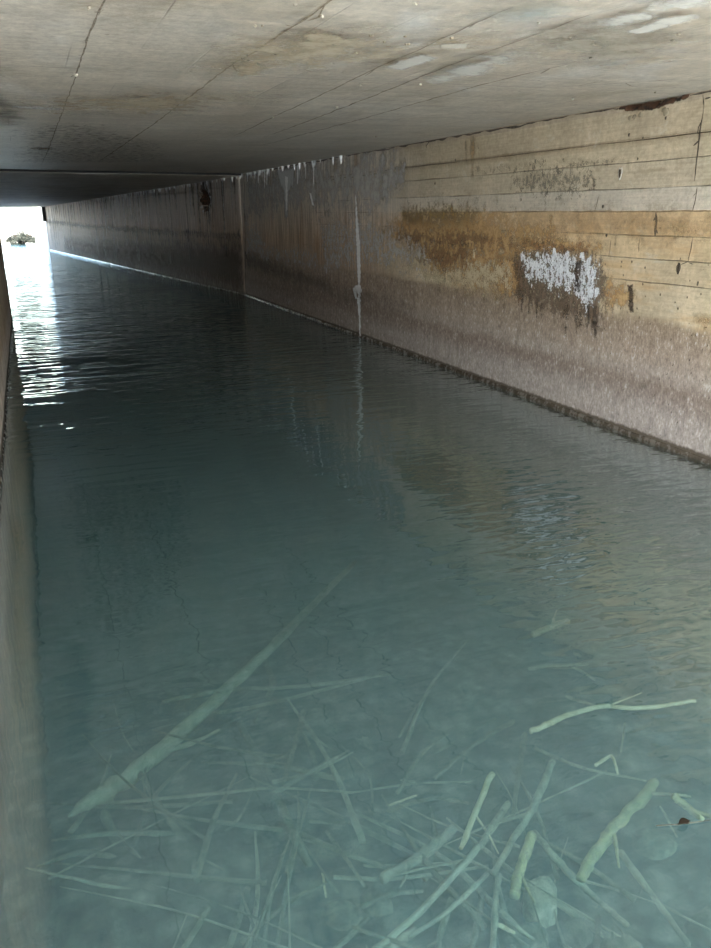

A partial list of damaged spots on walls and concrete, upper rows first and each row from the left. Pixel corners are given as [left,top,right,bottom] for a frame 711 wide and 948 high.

crack [43,0,105,160]
crack [100,0,332,161]
spalling [526,91,711,124]
crack [692,97,711,211]
water stain [47,154,406,336]
corrosion [383,204,603,303]
water stain [513,249,607,336]